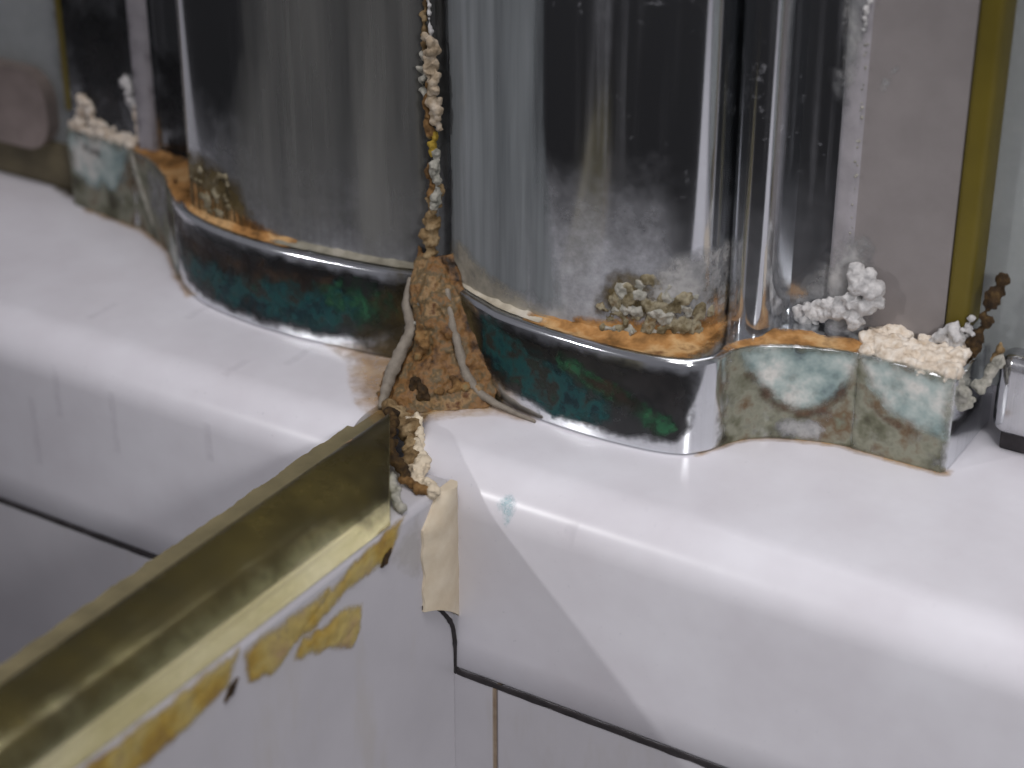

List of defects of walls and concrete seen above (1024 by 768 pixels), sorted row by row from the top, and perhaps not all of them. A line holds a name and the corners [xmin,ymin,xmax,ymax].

water stain [54,0,135,136]
water stain [595,244,731,336]
water stain [960,272,1011,358]
corrosion [0,145,862,758]
peeling [86,519,403,768]